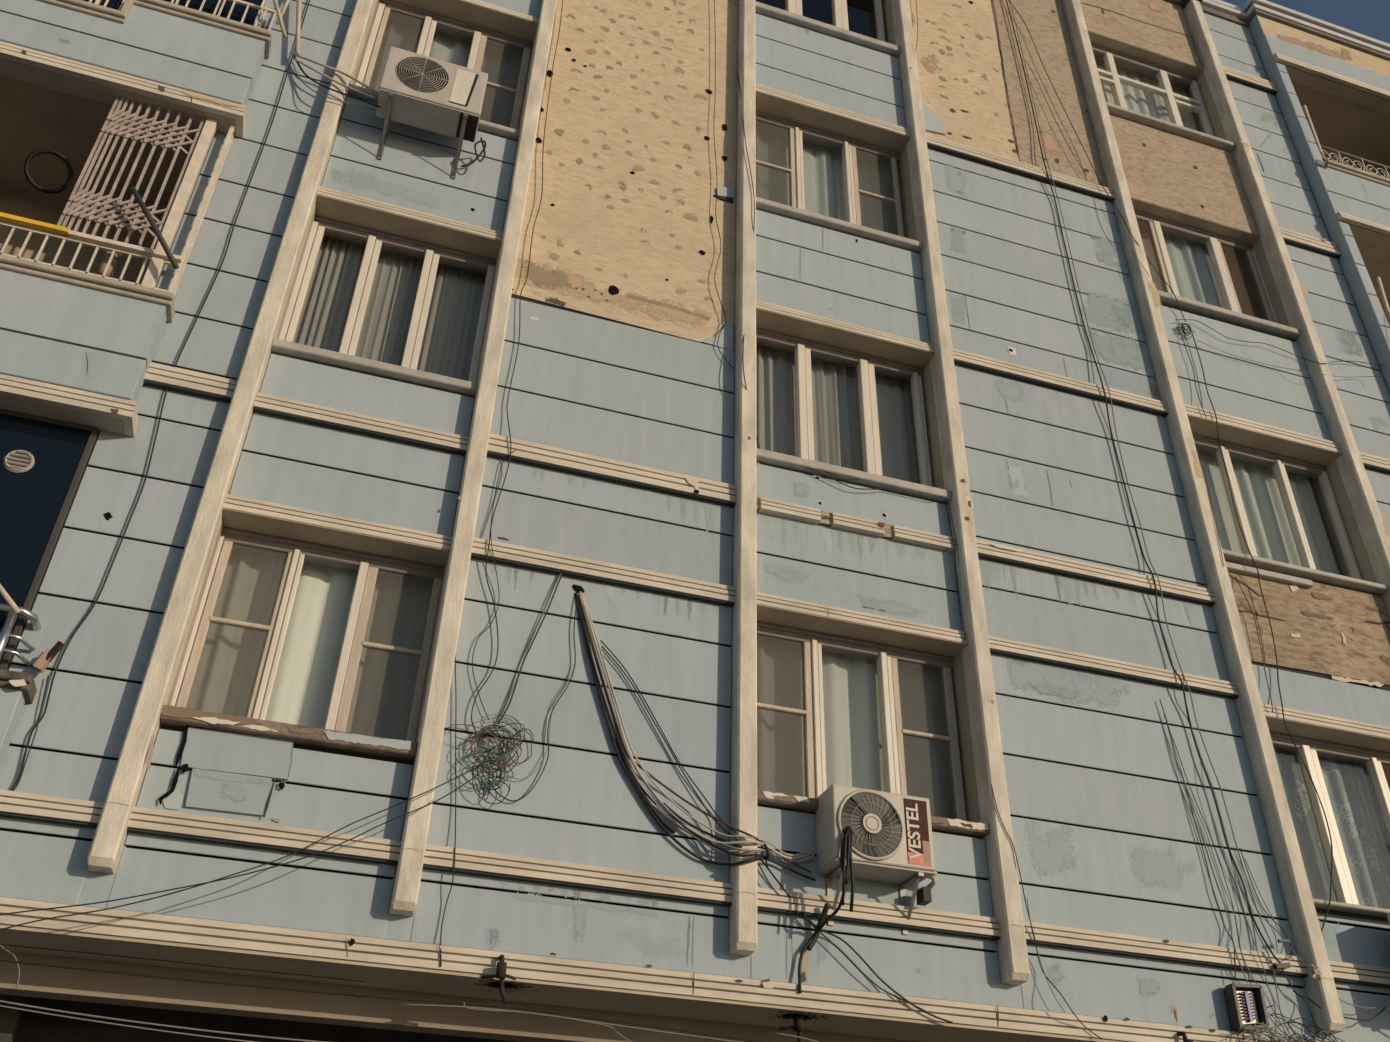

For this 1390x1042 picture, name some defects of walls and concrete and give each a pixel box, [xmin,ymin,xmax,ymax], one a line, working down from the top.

flaking render [909,0,1108,188]
flaking render [1080,0,1203,69]
flaking render [511,0,738,351]
flaking render [1109,114,1260,236]
flaking render [1228,571,1390,687]